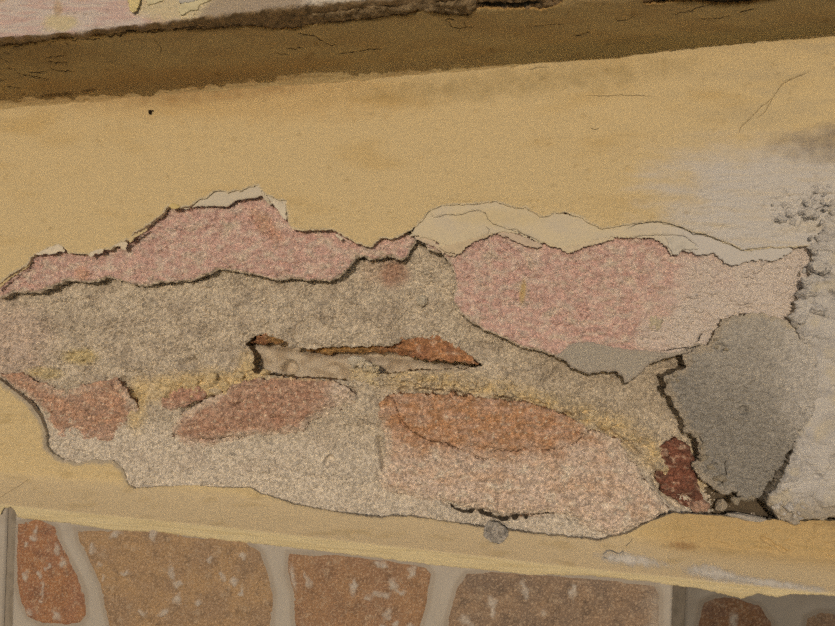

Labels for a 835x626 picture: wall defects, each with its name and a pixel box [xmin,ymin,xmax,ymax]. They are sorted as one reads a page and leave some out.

crack [739,74,804,132]
flaking render [0,185,812,544]